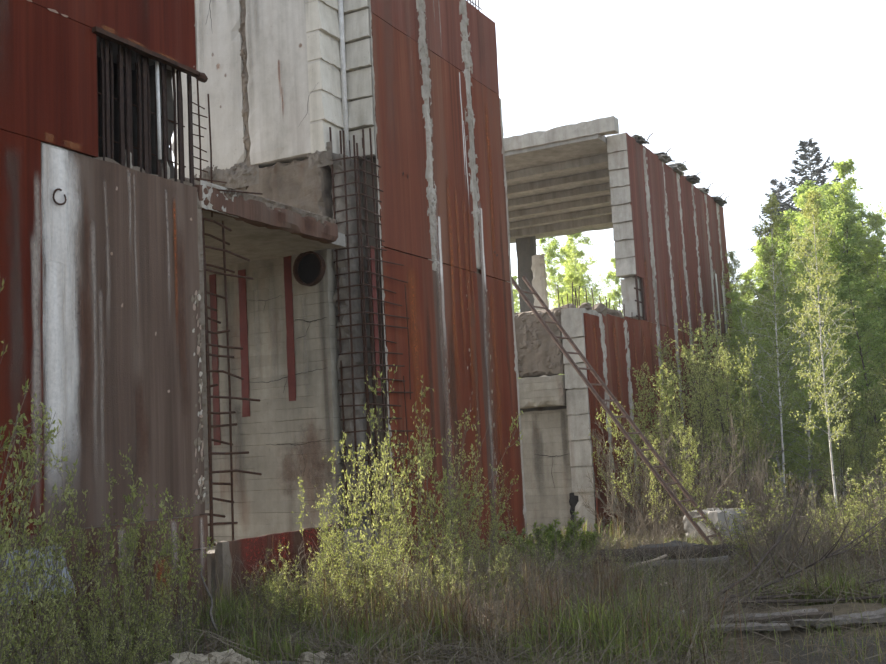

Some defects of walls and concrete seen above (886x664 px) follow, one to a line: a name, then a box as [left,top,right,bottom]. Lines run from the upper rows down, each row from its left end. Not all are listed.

leakage [33,144,80,462]
rust [79,216,92,393]
leakage [91,187,109,389]
spalling [190,0,336,546]